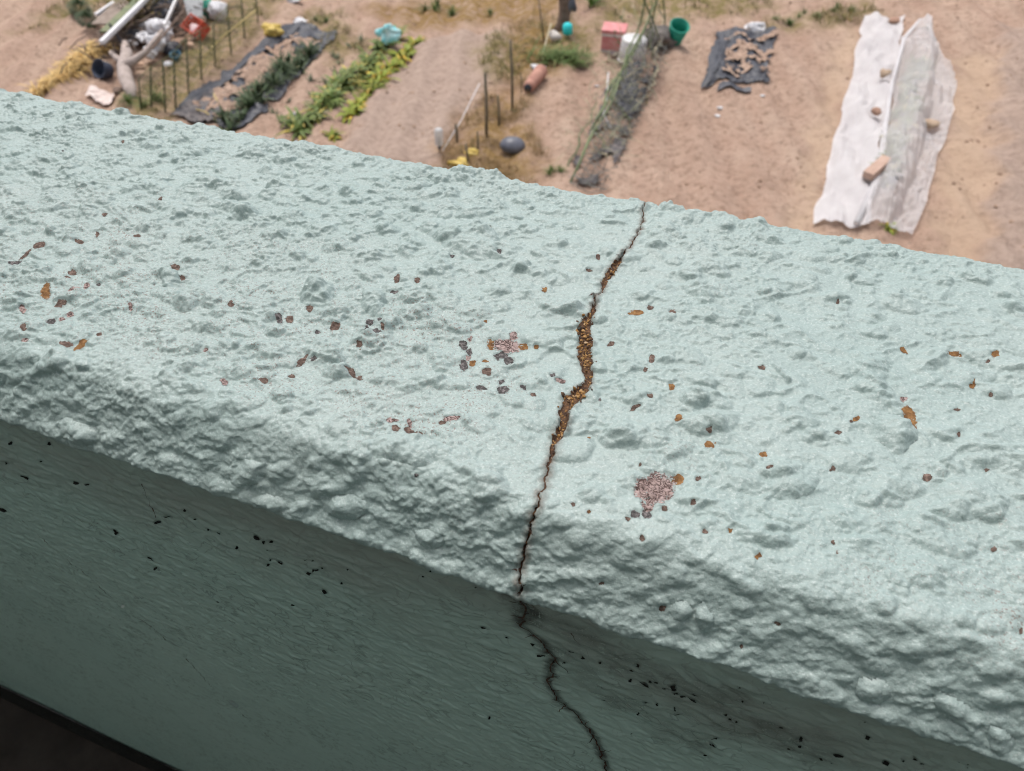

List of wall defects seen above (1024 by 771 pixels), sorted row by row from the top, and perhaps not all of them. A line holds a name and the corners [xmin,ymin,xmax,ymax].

spalling [458,331,539,397]
crack [510,203,645,771]
spalling [625,462,701,522]